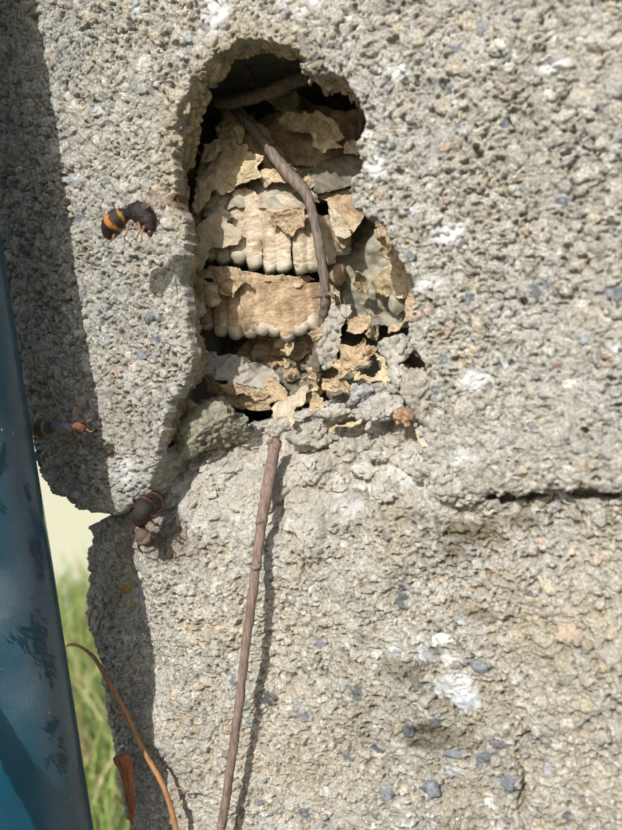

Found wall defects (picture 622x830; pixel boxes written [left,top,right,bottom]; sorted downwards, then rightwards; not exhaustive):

spalling [171,41,364,213]
spalling [166,228,208,448]
spalling [151,398,501,562]
crack [486,492,548,503]
crack [569,489,619,498]
crack [496,727,534,829]